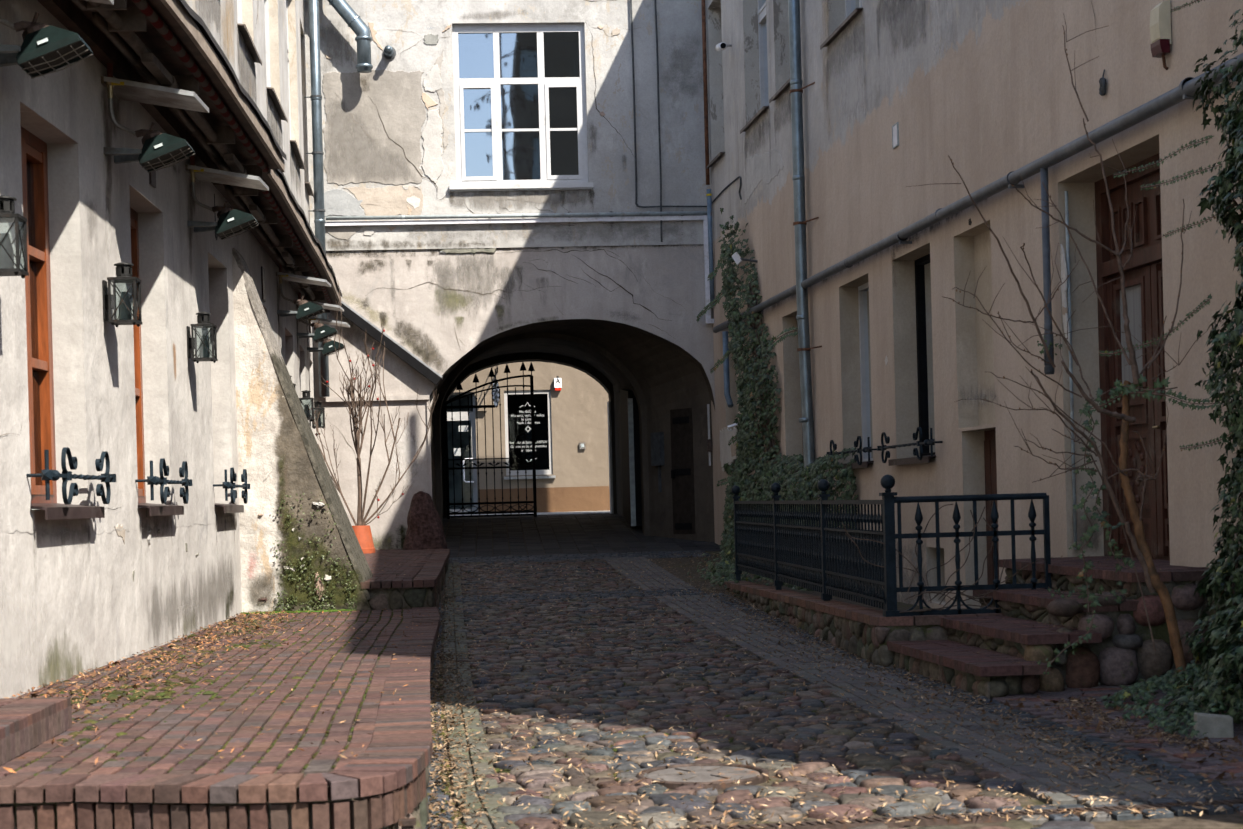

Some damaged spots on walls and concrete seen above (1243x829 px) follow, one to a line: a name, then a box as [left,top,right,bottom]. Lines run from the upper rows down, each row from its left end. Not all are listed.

leakage [328,240,349,257]
peeling [344,64,444,236]
mould [380,312,443,370]
leakage [362,241,519,323]
crack [335,93,670,332]
crack [586,0,641,155]